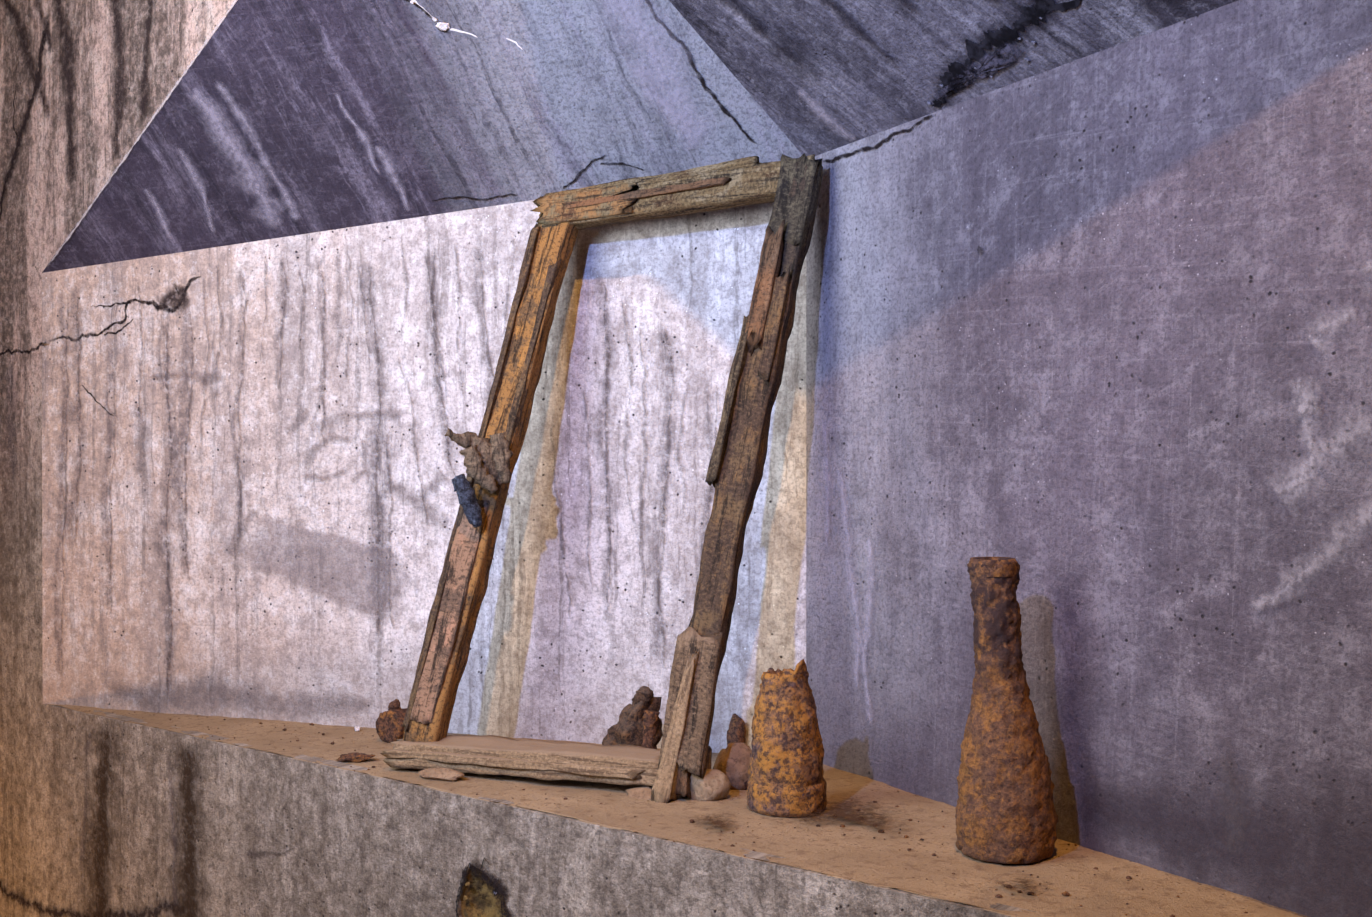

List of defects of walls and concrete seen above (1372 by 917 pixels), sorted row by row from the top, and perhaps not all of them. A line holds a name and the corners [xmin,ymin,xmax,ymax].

crack [405,0,522,49]
crack [645,0,755,143]
crack [825,0,1080,163]
crack [0,31,46,218]
crack [434,193,516,201]
crack [563,155,643,189]
crack [0,276,201,356]
leakage [90,733,110,917]
leakage [176,754,199,917]
crack [0,881,189,917]
spalling [455,858,512,917]